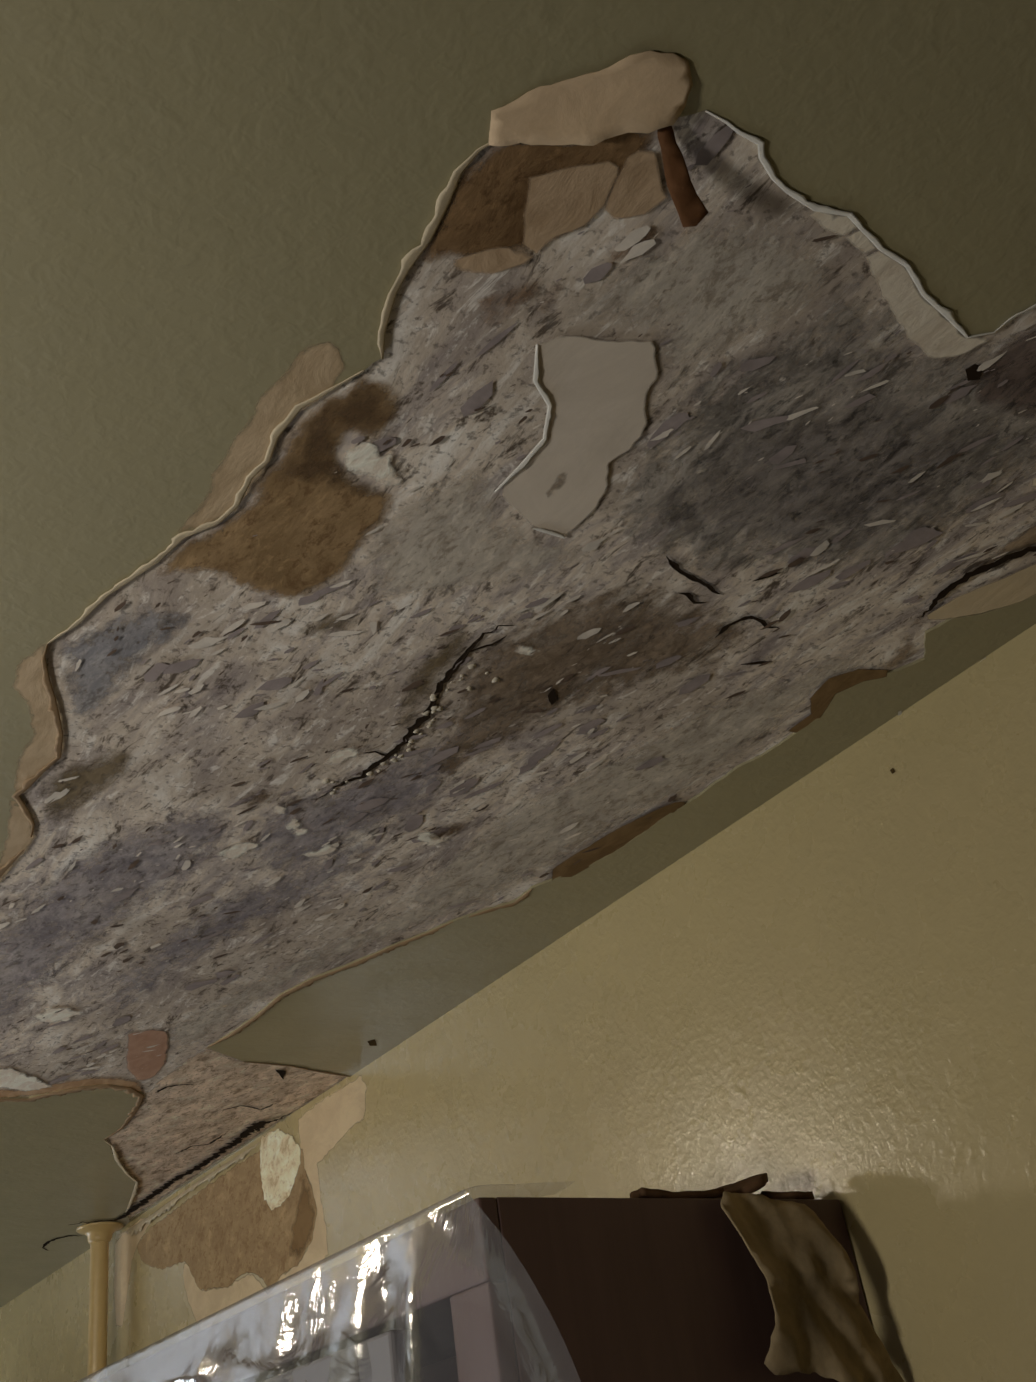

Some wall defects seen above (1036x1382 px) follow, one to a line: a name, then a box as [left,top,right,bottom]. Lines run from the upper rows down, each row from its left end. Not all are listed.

leakage [426,133,649,262]
leakage [165,380,394,597]
flaking render [0,50,1036,1092]
leakage [620,304,1036,571]
crack [916,546,1036,618]
leakage [46,754,127,818]
crack [317,625,514,799]
leakage [438,584,738,776]
leakage [552,801,686,880]
leakage [789,669,888,733]
flaking render [0,1046,350,1219]
peeling [114,1076,367,1331]